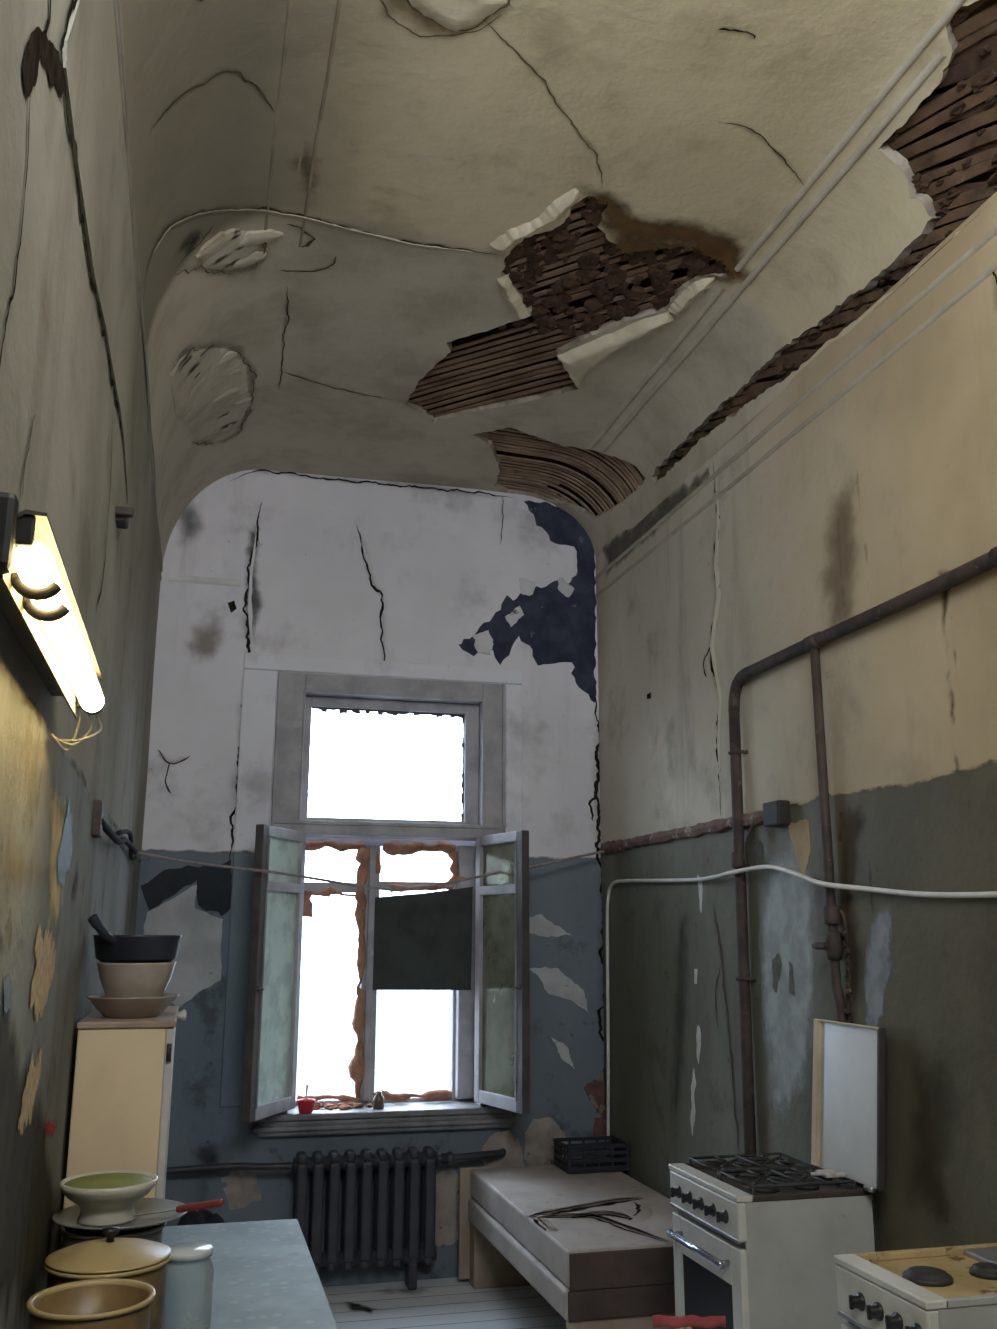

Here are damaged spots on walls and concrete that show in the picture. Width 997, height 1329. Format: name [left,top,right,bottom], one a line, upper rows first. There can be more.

crack [490,26,603,180]
crack [718,28,756,40]
crack [719,122,804,185]
crack [0,103,30,366]
crack [45,0,128,611]
flaking render [405,185,735,422]
flaking render [459,0,997,703]
crack [242,503,262,653]
crack [229,469,507,539]
crack [356,525,387,661]
crack [229,747,239,860]
peeling [864,910,892,1027]